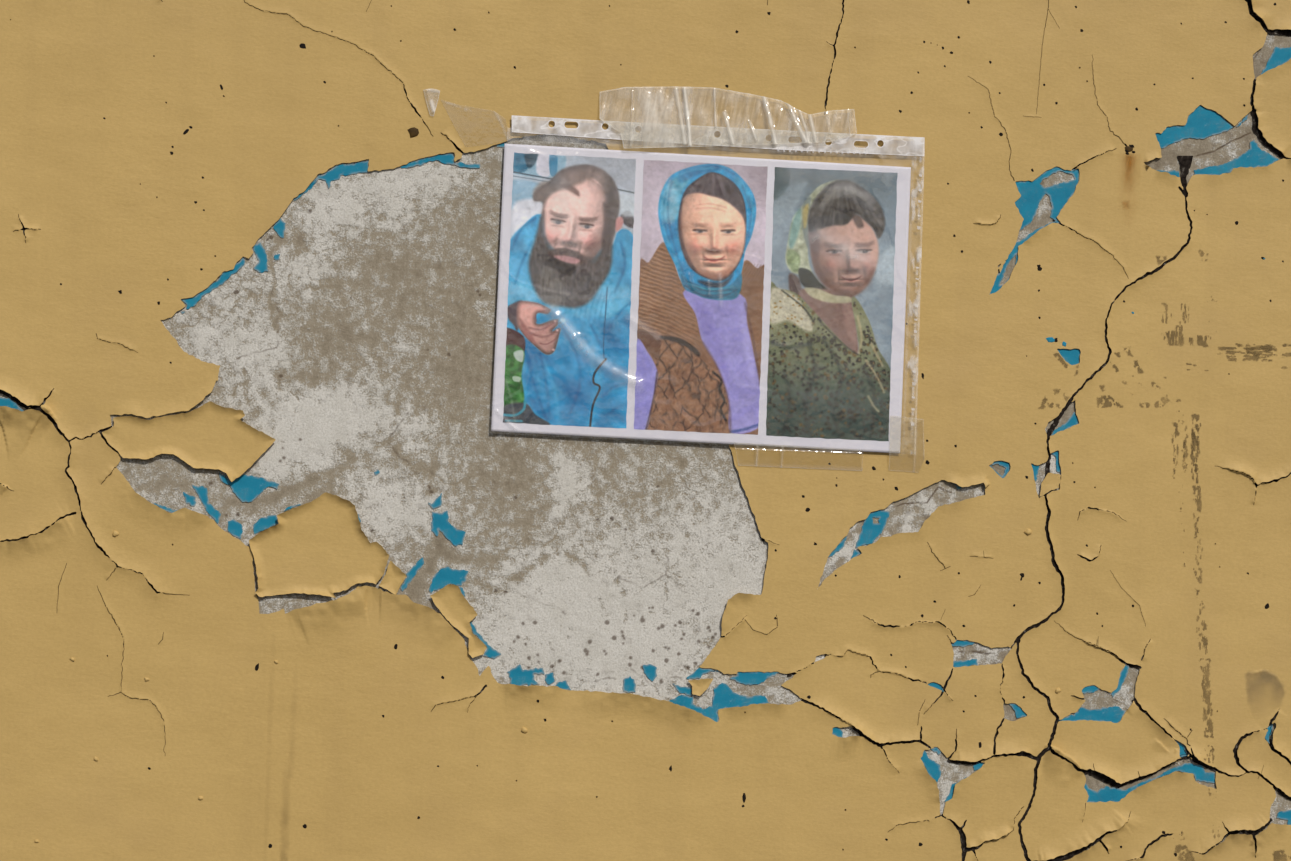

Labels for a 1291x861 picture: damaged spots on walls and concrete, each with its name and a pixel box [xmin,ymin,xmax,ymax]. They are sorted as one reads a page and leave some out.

crack [244,0,463,153]
crack [824,0,844,115]
crack [1072,55,1127,171]
peeling [1144,105,1284,184]
crack [1245,0,1291,36]
crack [1250,79,1291,159]
peeling [990,166,1079,294]
crack [0,388,190,753]
peeling [102,133,802,722]
peeling [817,480,986,589]
peeling [989,461,1011,478]
crack [787,156,1291,861]